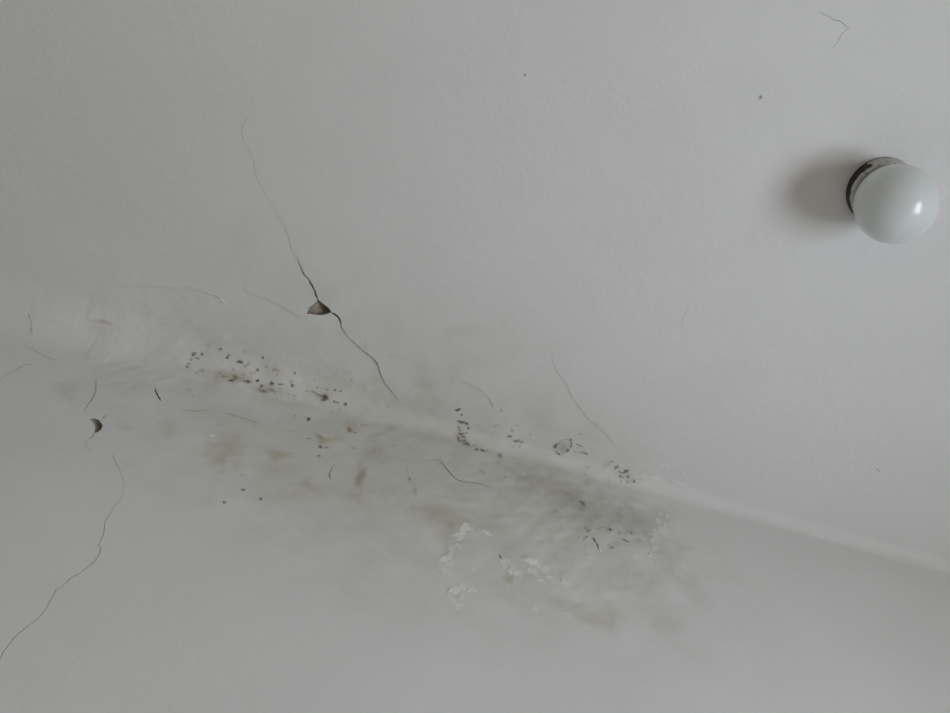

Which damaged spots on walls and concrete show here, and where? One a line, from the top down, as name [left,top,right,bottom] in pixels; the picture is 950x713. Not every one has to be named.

spalling [307,299,331,315]
crack [242,118,402,399]
crack [0,380,124,658]